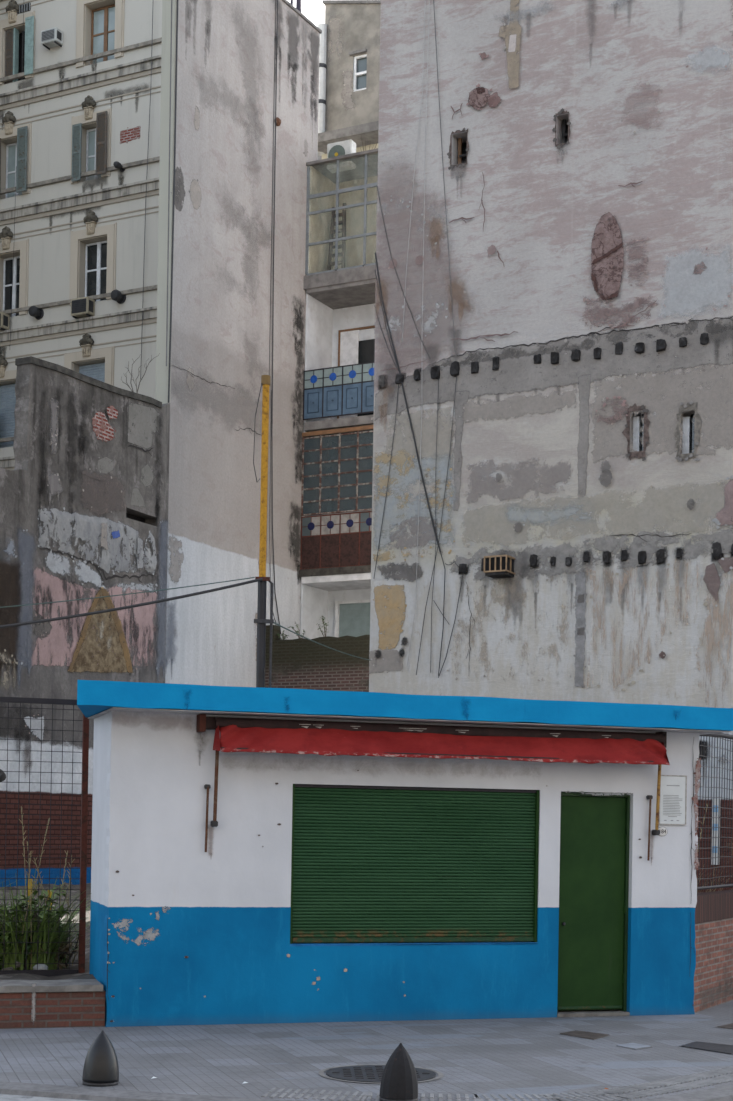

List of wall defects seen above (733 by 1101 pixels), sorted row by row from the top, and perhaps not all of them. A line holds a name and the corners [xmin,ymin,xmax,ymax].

flaking render [466,83,501,110]
damp [293,302,304,483]
damp [0,529,81,685]
damp [124,520,175,675]
peeling [373,580,408,657]
peeling [112,906,170,946]